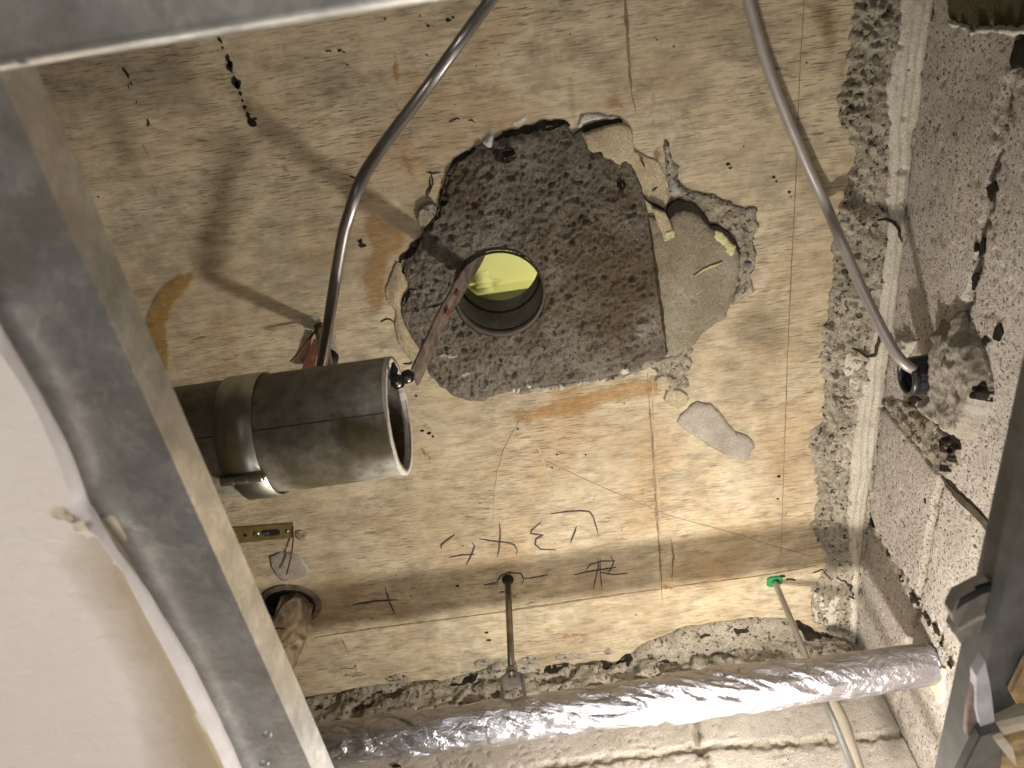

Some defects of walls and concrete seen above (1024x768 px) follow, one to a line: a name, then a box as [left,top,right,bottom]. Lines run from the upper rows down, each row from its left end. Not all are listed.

peeling [418,202,437,227]
spalling [584,122,760,305]
corrosion [147,274,192,371]
peeling [385,261,420,363]
corrosion [517,381,662,421]
spalling [511,348,694,409]